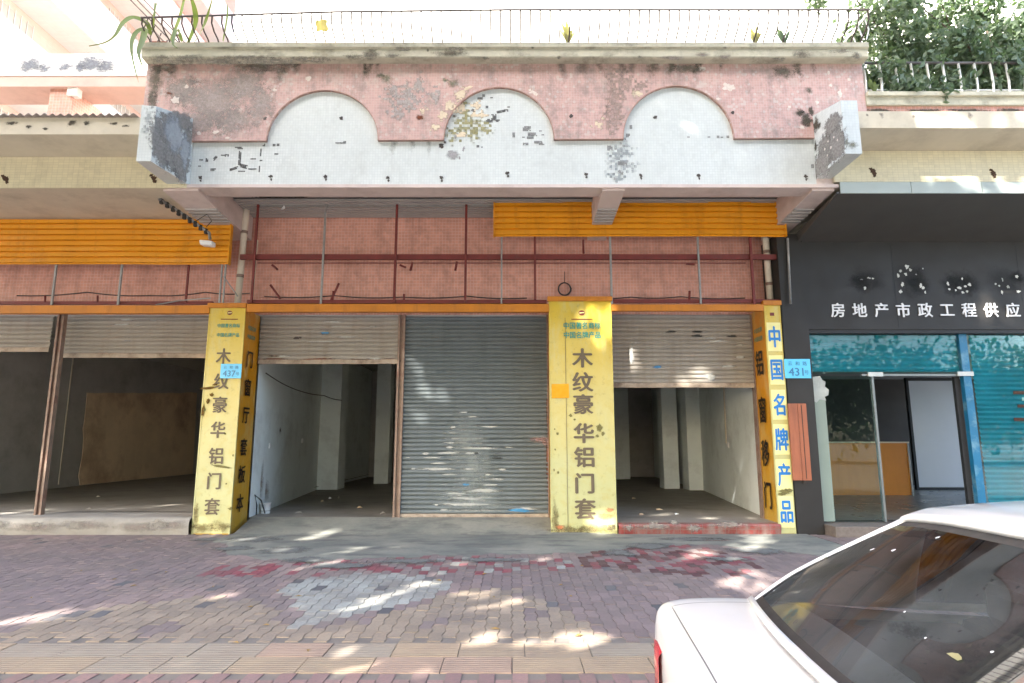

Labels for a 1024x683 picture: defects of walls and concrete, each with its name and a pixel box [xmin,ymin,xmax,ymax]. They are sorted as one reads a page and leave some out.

peeling [383,77,510,131]
peeling [148,84,279,185]
peeling [439,132,483,159]